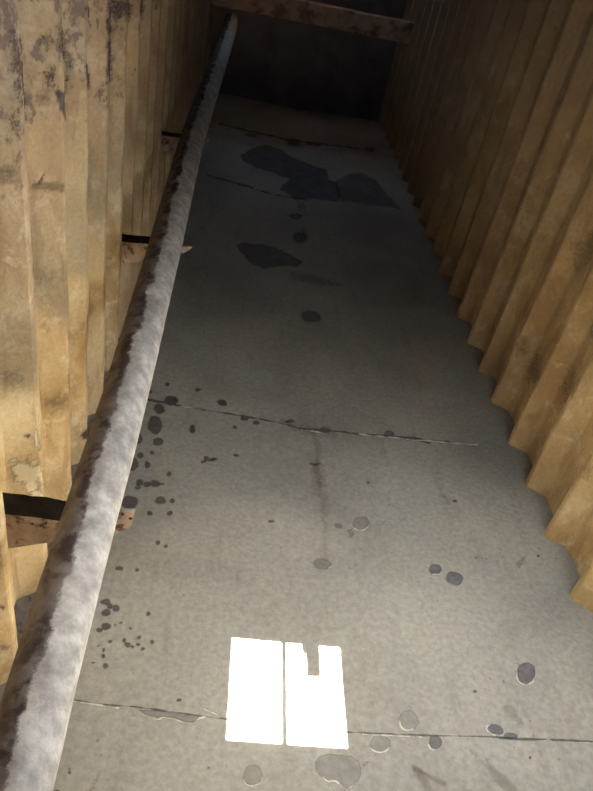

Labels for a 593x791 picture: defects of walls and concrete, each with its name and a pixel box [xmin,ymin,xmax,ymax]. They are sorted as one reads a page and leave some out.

damp [241,145,399,208]
damp [237,243,302,268]
crack [147,398,479,446]
peeling [10,430,43,497]
crack [73,699,230,724]
crack [347,731,593,744]